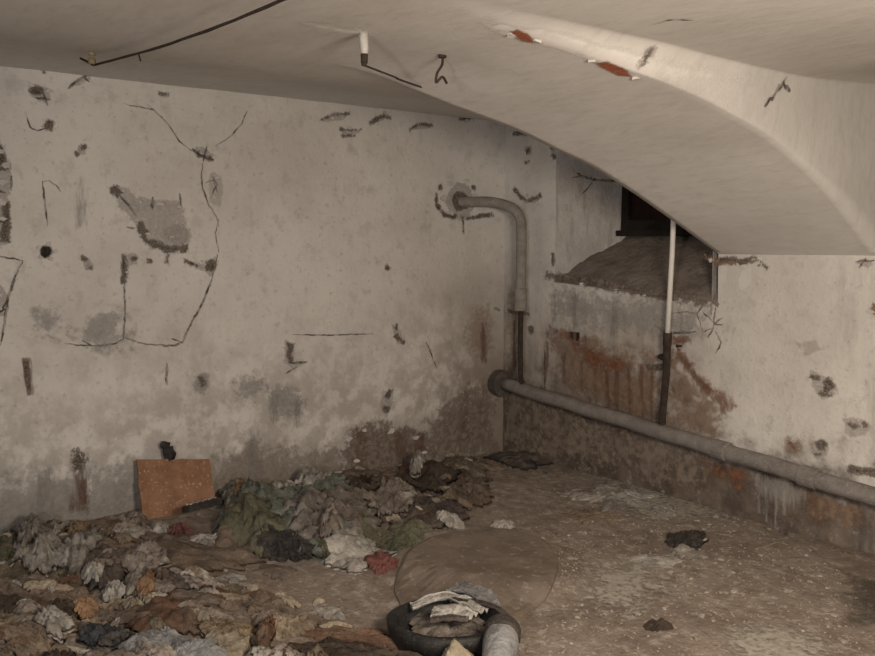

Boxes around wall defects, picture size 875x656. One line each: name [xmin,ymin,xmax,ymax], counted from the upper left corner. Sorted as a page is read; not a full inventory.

flaking render [507,30,541,44]
flaking render [588,47,656,81]
flaking render [0,146,12,245]
crack [65,105,219,382]
flaking render [110,185,217,284]
crack [1,256,23,342]
corrosion [668,336,734,440]
flaking render [810,370,839,399]